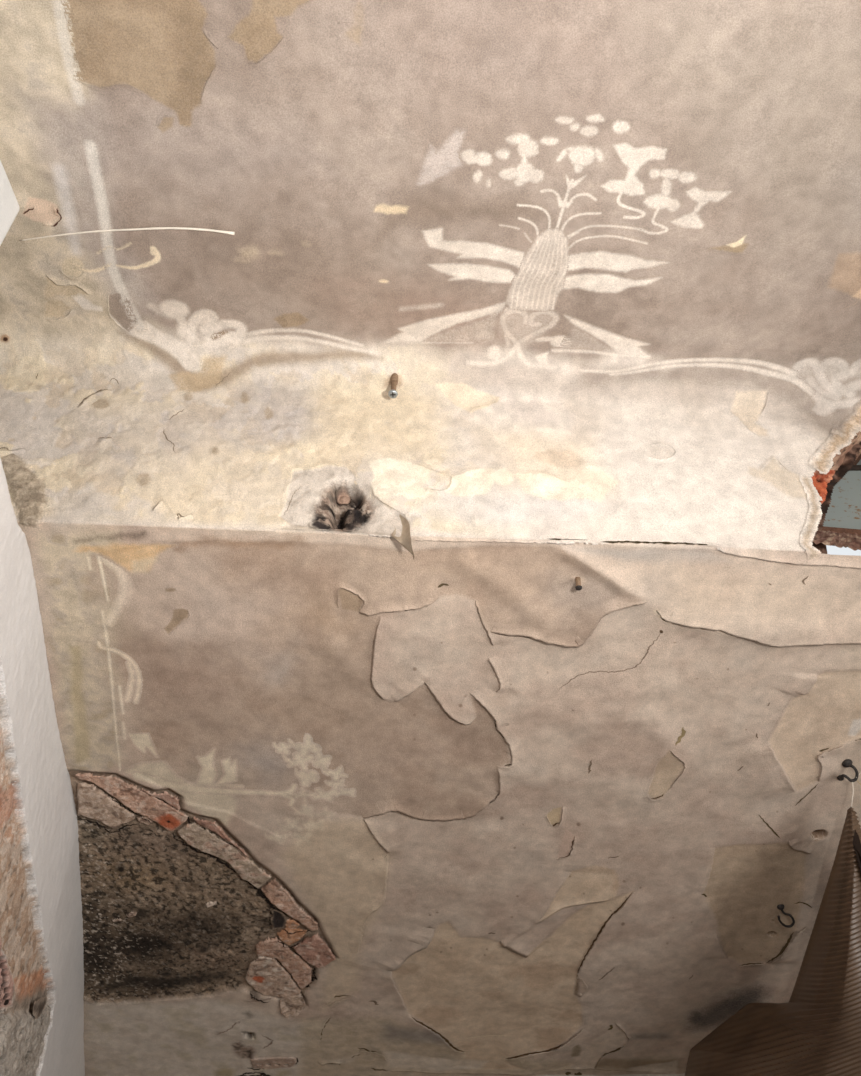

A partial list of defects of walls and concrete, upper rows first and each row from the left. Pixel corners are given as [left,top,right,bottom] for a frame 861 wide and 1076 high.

peeling [824,250,861,314]
peeling [728,388,772,438]
flaking render [745,399,861,560]
peeling [68,446,649,1076]
peeling [643,728,690,803]
peeling [762,669,861,806]
peeling [698,815,815,970]